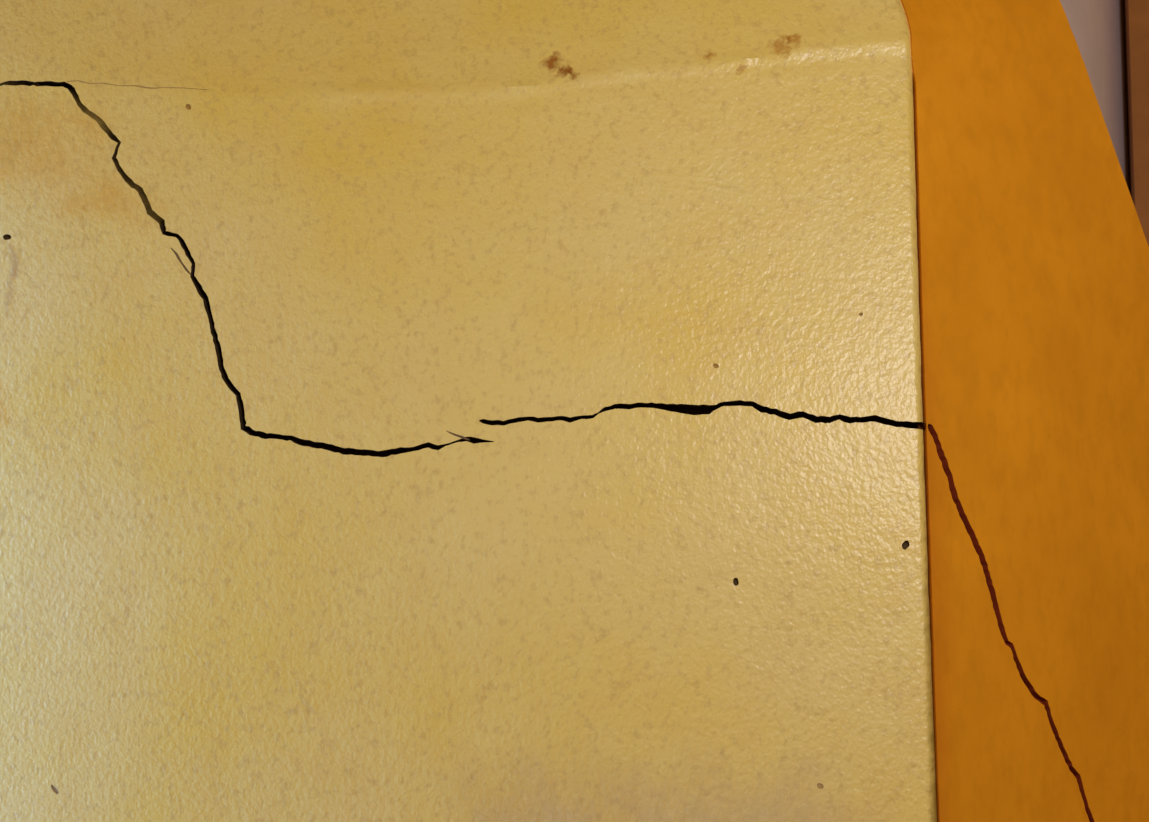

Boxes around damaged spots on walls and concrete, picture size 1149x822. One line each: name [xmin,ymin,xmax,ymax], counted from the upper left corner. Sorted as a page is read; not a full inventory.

crack [0,80,494,457]
crack [481,79,1094,822]